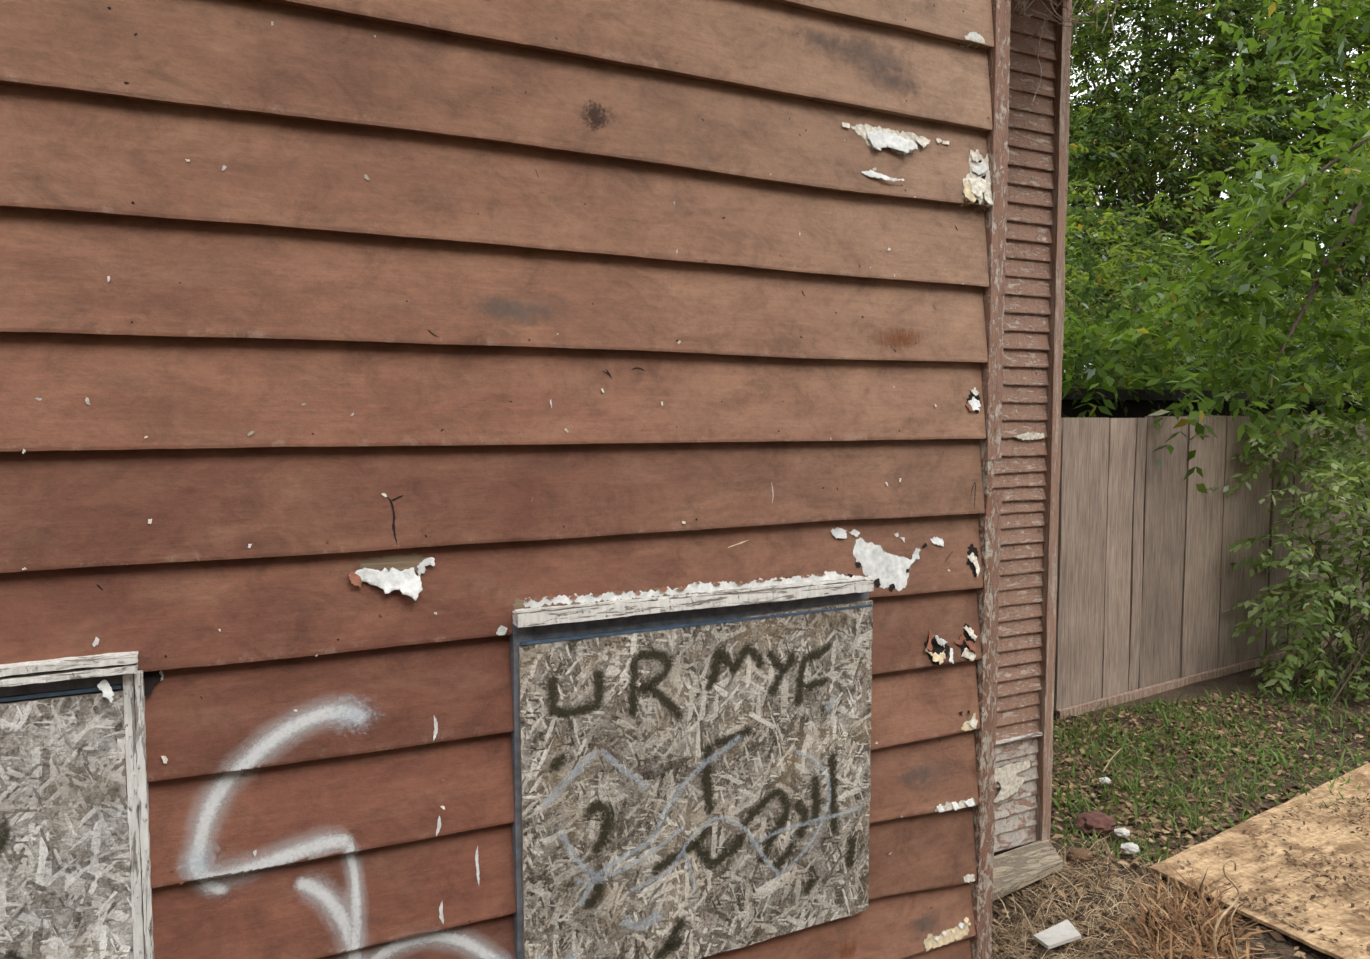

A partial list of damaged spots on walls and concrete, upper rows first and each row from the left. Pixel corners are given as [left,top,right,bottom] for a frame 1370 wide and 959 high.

peeling [842,122,950,192]
peeling [959,149,993,213]
peeling [348,553,435,601]
peeling [513,527,944,609]
peeling [924,623,978,665]
peeling [933,797,976,812]
peeling [921,917,971,952]